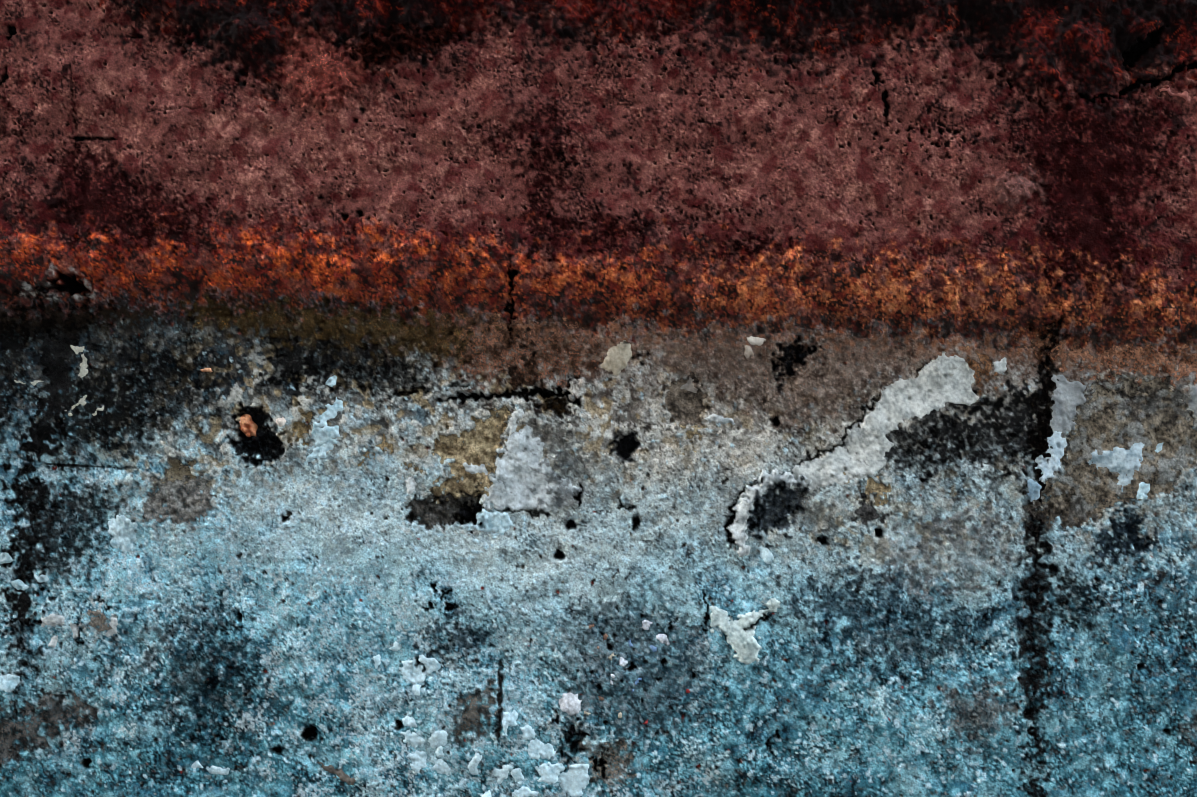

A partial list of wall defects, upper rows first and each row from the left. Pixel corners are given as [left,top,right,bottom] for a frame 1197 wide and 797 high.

damp [257,328,430,409]
spalling [0,210,1197,569]
corrosion [648,313,929,436]
damp [0,279,230,709]
damp [131,570,283,761]
peeling [373,641,443,695]
flaking render [423,583,458,611]
peeling [400,592,780,797]